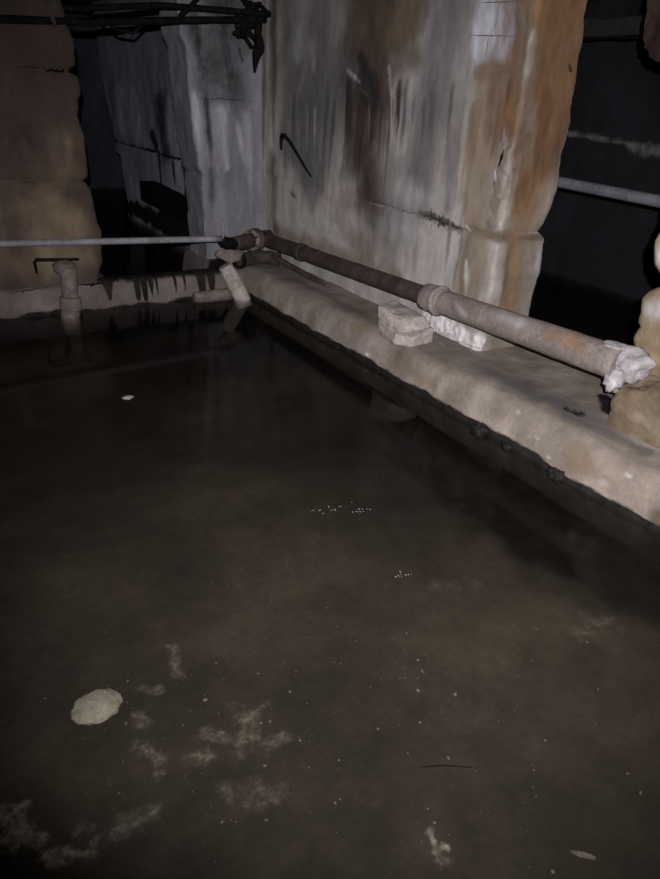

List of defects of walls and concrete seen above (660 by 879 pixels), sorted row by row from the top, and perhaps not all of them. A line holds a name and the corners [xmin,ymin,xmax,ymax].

damp [191,92,228,169]
damp [285,0,340,194]
crack [370,199,490,239]
damp [410,0,469,206]
crack [493,132,507,185]
rust [478,0,587,310]